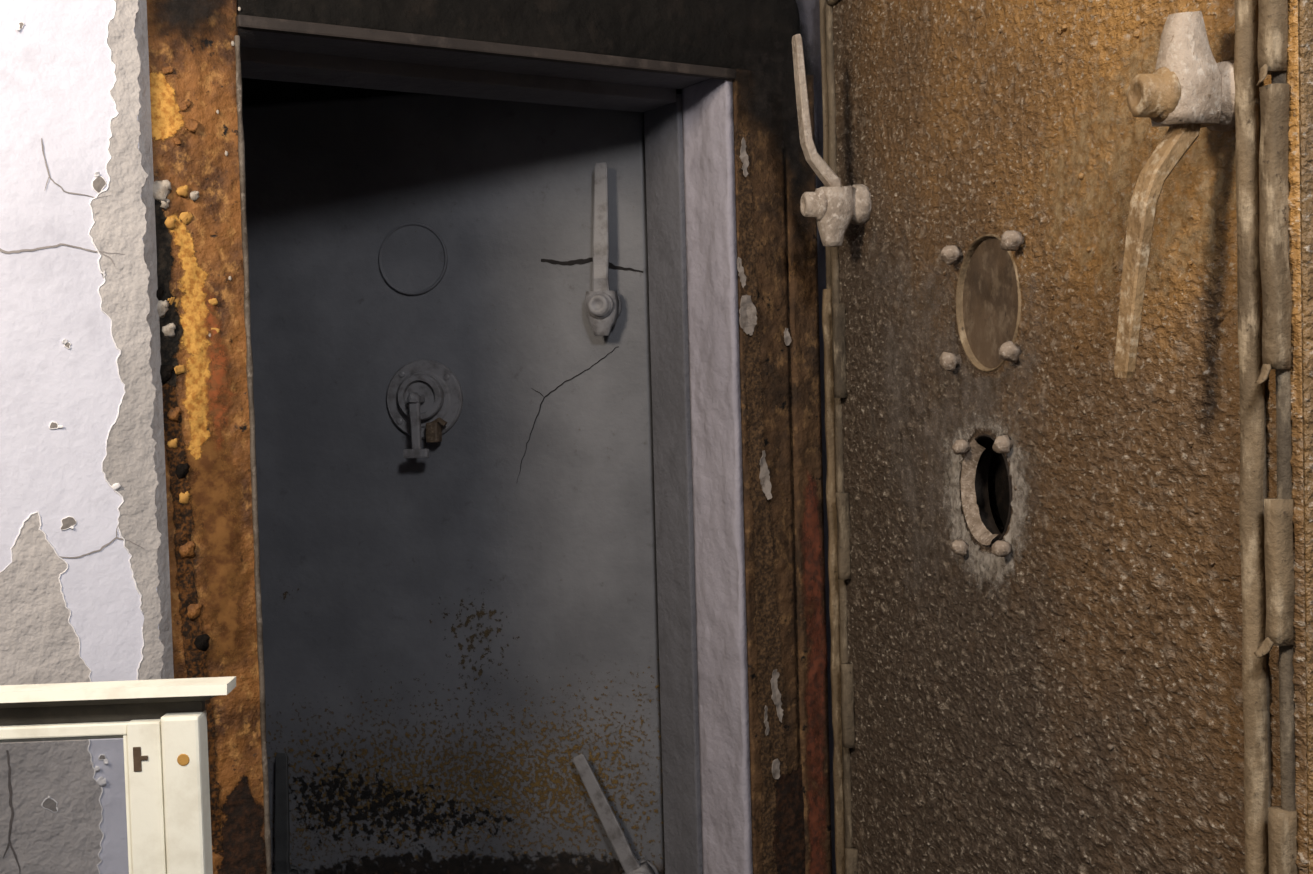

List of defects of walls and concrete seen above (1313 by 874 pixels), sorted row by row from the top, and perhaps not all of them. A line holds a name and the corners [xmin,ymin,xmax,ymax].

crack [0,243,125,266]
crack [41,138,110,198]
peeling [88,0,220,680]
corrosion [185,290,253,661]
peeling [0,511,92,685]
peeling [0,739,109,874]
spalling [205,699,273,874]
corrosion [266,599,664,874]
corrosion [802,474,827,874]